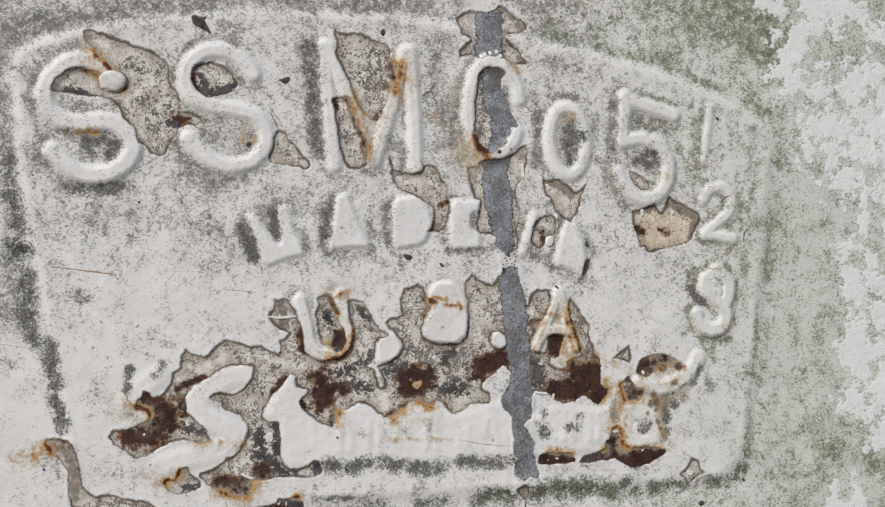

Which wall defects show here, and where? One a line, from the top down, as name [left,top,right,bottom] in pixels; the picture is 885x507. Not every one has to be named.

peeling [52,30,202,156]
peeling [191,63,238,97]
peeling [332,29,398,169]
peeling [632,198,700,252]
peeling [109,72,527,497]
corrosion [119,399,154,425]
corrosion [388,397,436,426]
peeling [525,285,607,405]
corrosion [600,352,685,453]
peeling [615,346,677,401]
peeling [47,439,154,507]
peeling [539,430,666,468]